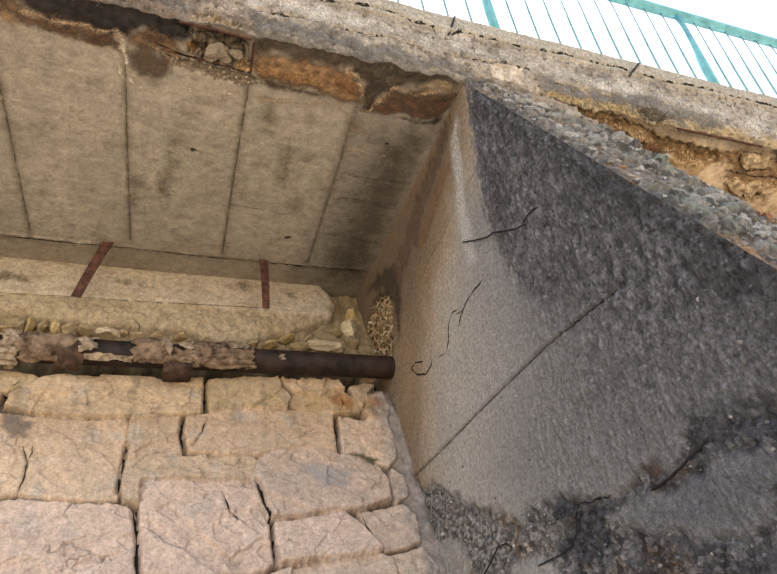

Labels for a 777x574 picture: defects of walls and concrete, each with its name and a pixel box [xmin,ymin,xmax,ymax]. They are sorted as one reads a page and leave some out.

spalling [161,11,260,85]
crack [411,281,619,476]
crack [179,387,208,449]
crack [6,436,33,500]
crack [117,448,127,495]
crack [132,513,140,574]
crack [257,483,275,561]
crack [550,495,611,525]